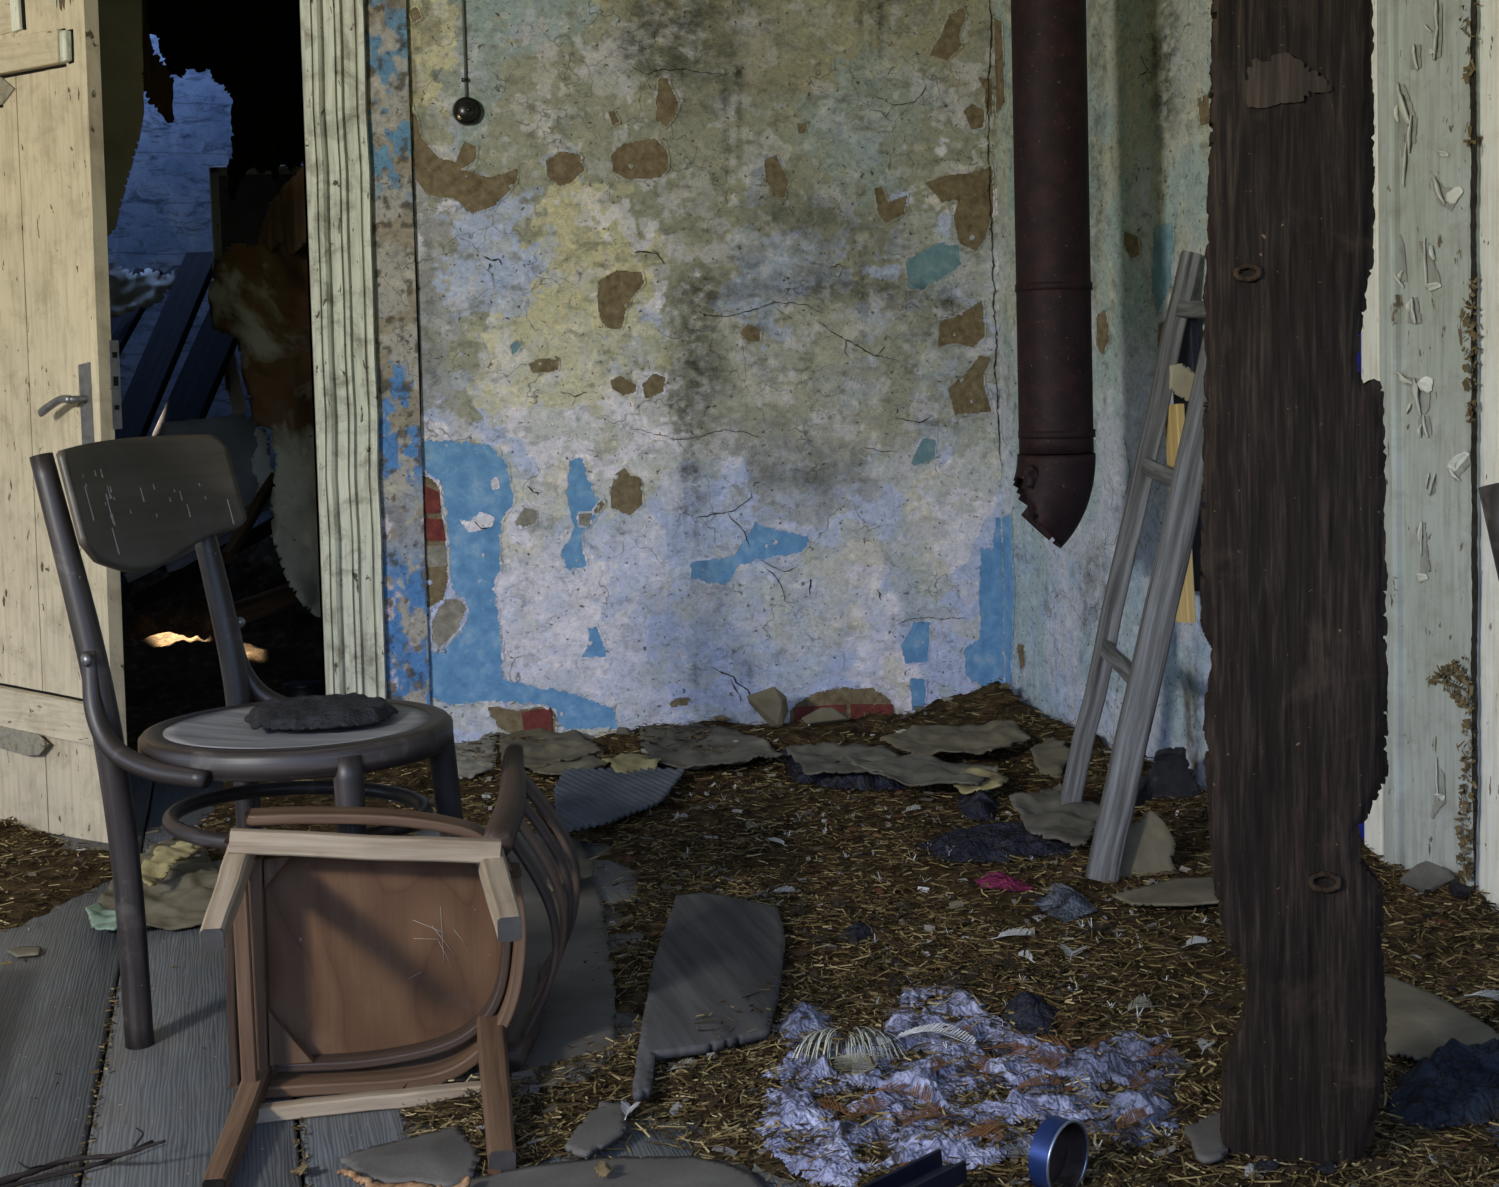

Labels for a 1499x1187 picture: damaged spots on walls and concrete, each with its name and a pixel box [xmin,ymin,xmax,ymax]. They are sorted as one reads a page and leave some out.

flaking render [410,103,520,215]
flaking render [544,141,590,187]
flaking render [606,76,684,182]
peeling [1394,0,1442,187]
flaking render [873,162,995,291]
flaking render [509,336,561,375]
flaking render [595,268,656,331]
flaking render [936,299,993,417]
peeling [421,438,619,734]
peeling [556,456,645,575]
peeling [688,516,811,587]
peeling [949,511,1032,687]